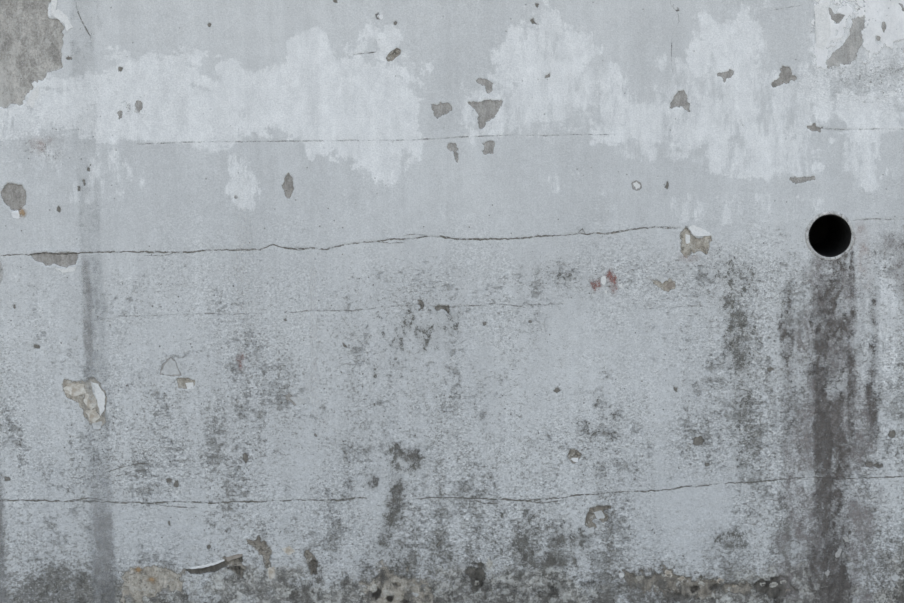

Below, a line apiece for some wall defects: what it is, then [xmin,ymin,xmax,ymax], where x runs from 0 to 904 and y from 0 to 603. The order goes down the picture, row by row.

peeling [0,0,73,108]
peeling [827,7,866,68]
peeling [468,78,503,129]
spalling [1,183,26,219]
crack [3,226,671,256]
water stain [776,251,881,603]
crack [0,485,367,508]
water stain [359,441,428,588]
water stain [505,509,609,592]
crack [417,476,900,504]
water stain [712,526,750,553]
spalling [612,564,799,603]